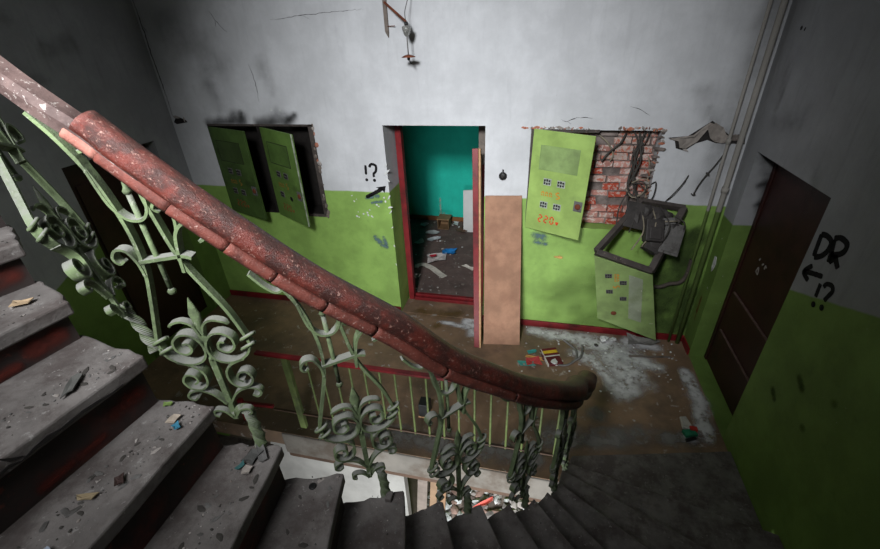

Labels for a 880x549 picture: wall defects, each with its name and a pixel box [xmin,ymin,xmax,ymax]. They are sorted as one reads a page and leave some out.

spalling [521,121,745,224]